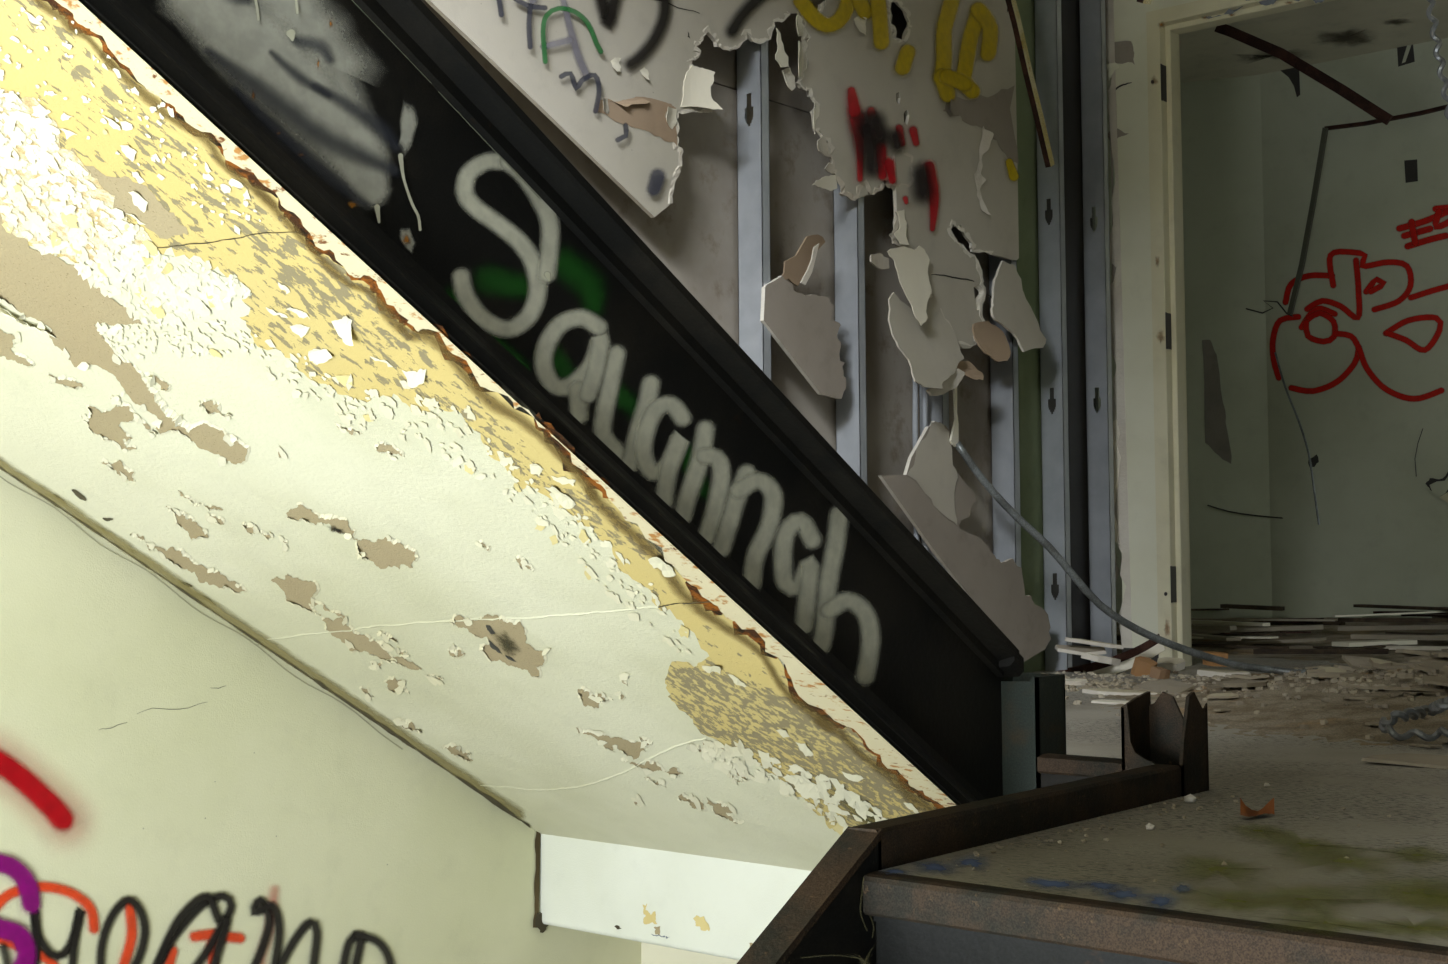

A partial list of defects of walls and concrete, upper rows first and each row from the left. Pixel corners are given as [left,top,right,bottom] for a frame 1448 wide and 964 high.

peeling [943,85,1019,215]
spalling [947,220,994,322]
peeling [0,0,936,835]